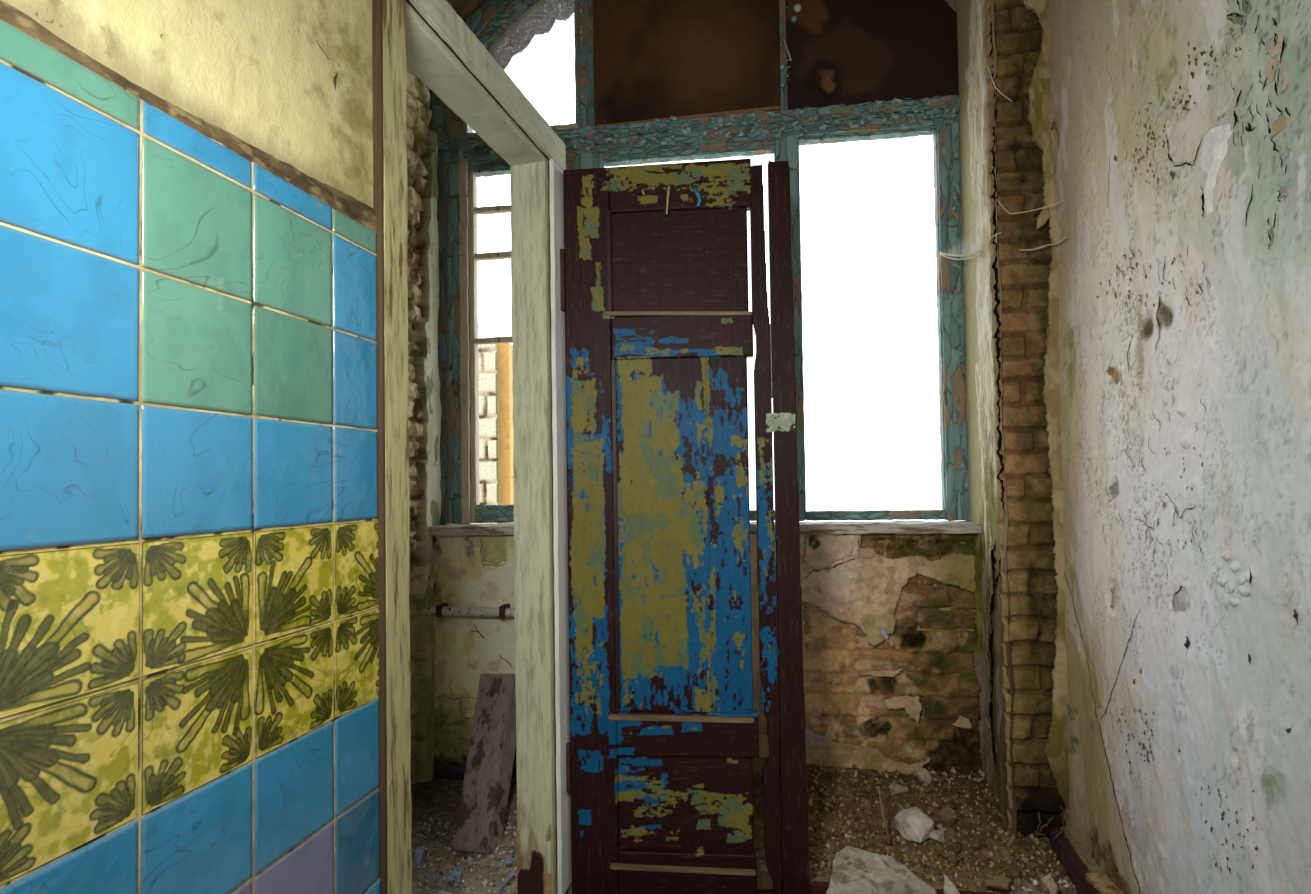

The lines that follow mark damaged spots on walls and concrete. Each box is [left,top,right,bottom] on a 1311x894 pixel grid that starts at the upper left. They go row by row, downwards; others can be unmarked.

peeling [561,74,959,151]
flaking render [985,0,1069,837]
flaking render [800,533,987,776]